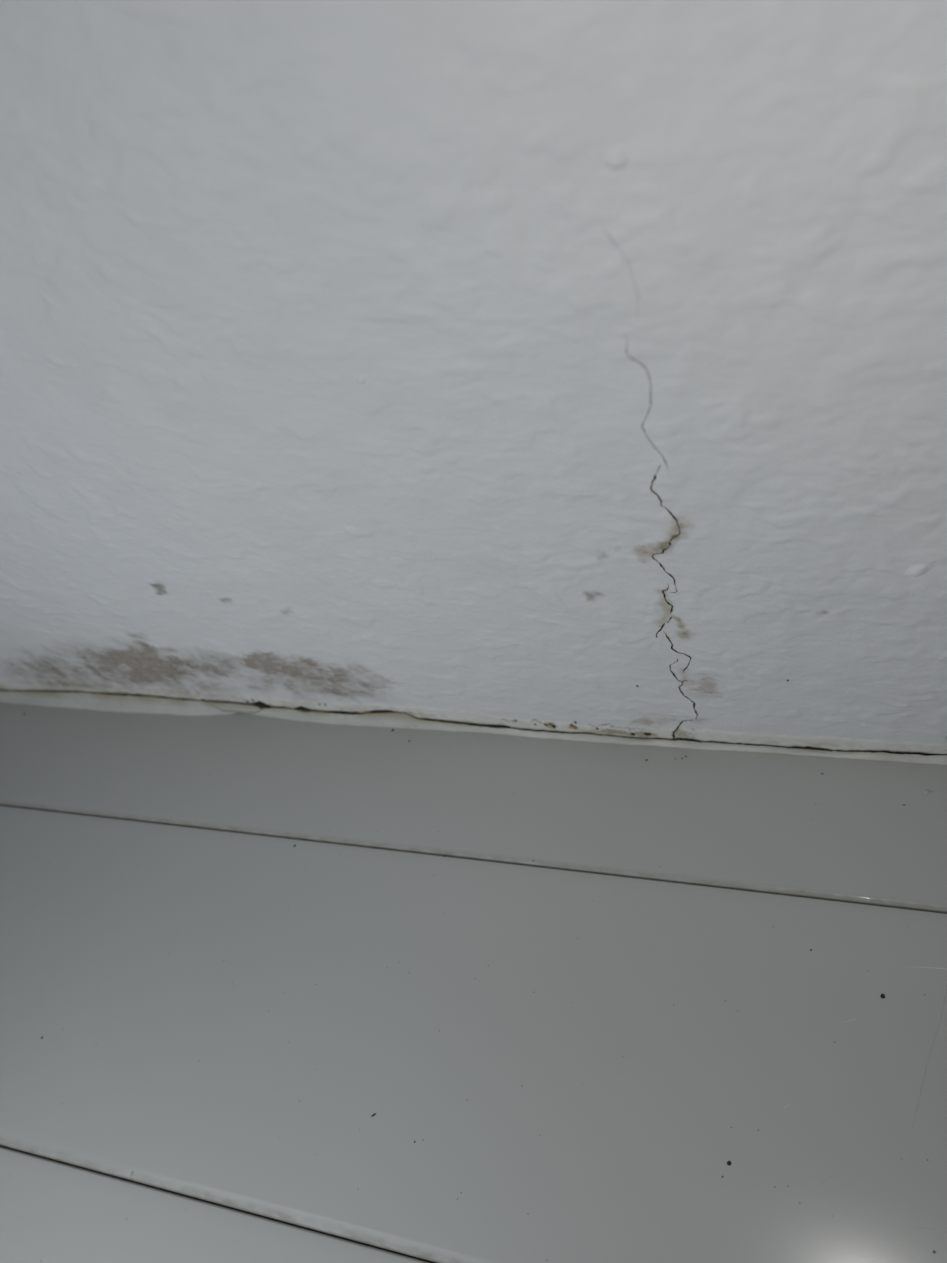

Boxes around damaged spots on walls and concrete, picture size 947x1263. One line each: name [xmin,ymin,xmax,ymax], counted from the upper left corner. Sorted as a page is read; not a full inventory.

crack [0,352,947,756]
damp [88,643,181,682]
damp [245,654,315,682]